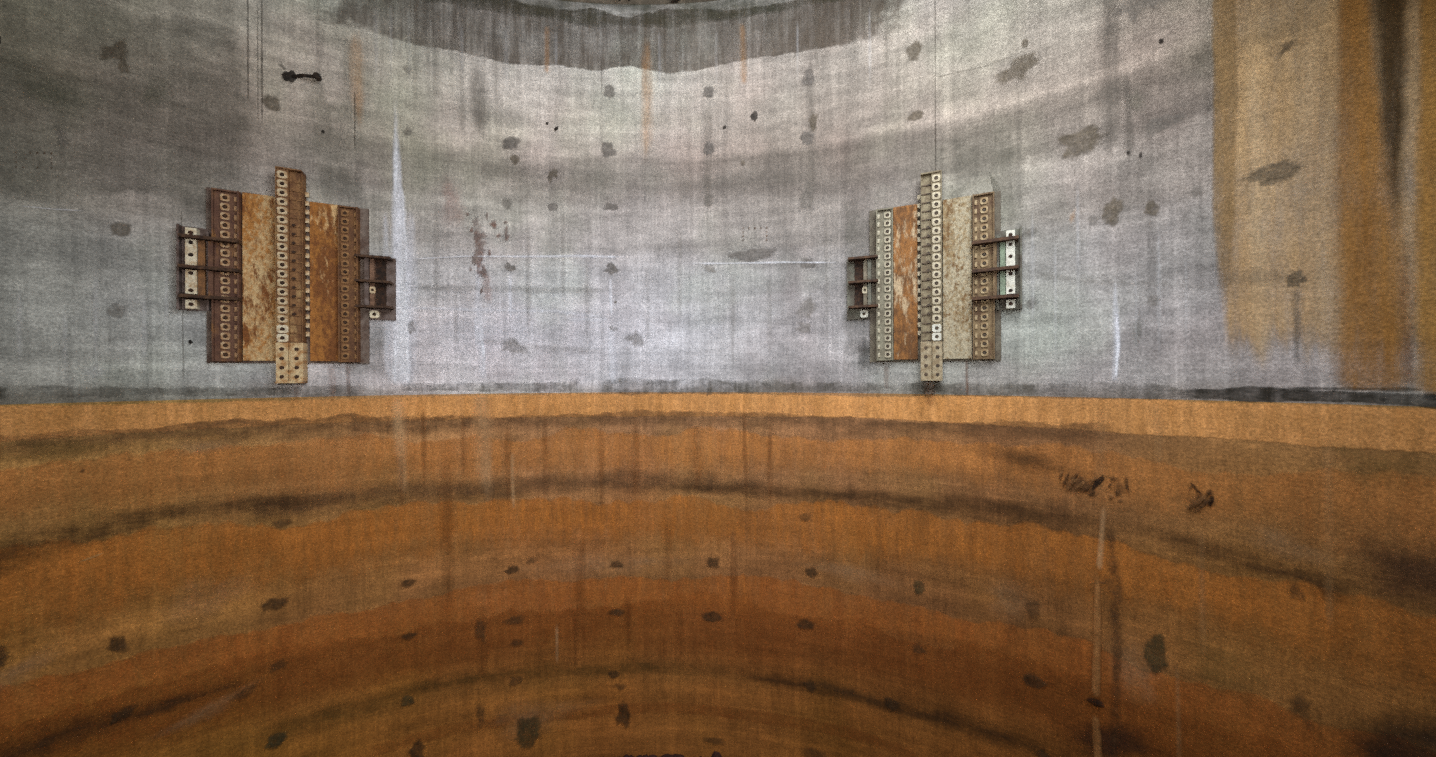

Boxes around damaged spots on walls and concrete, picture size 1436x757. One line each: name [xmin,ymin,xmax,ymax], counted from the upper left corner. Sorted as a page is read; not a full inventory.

water stain [343,0,885,72]
corrosion [1214,0,1436,391]
water stain [393,145,410,382]
corrosion [0,394,1436,453]
spalling [1059,471,1129,502]
spalling [1186,484,1214,510]